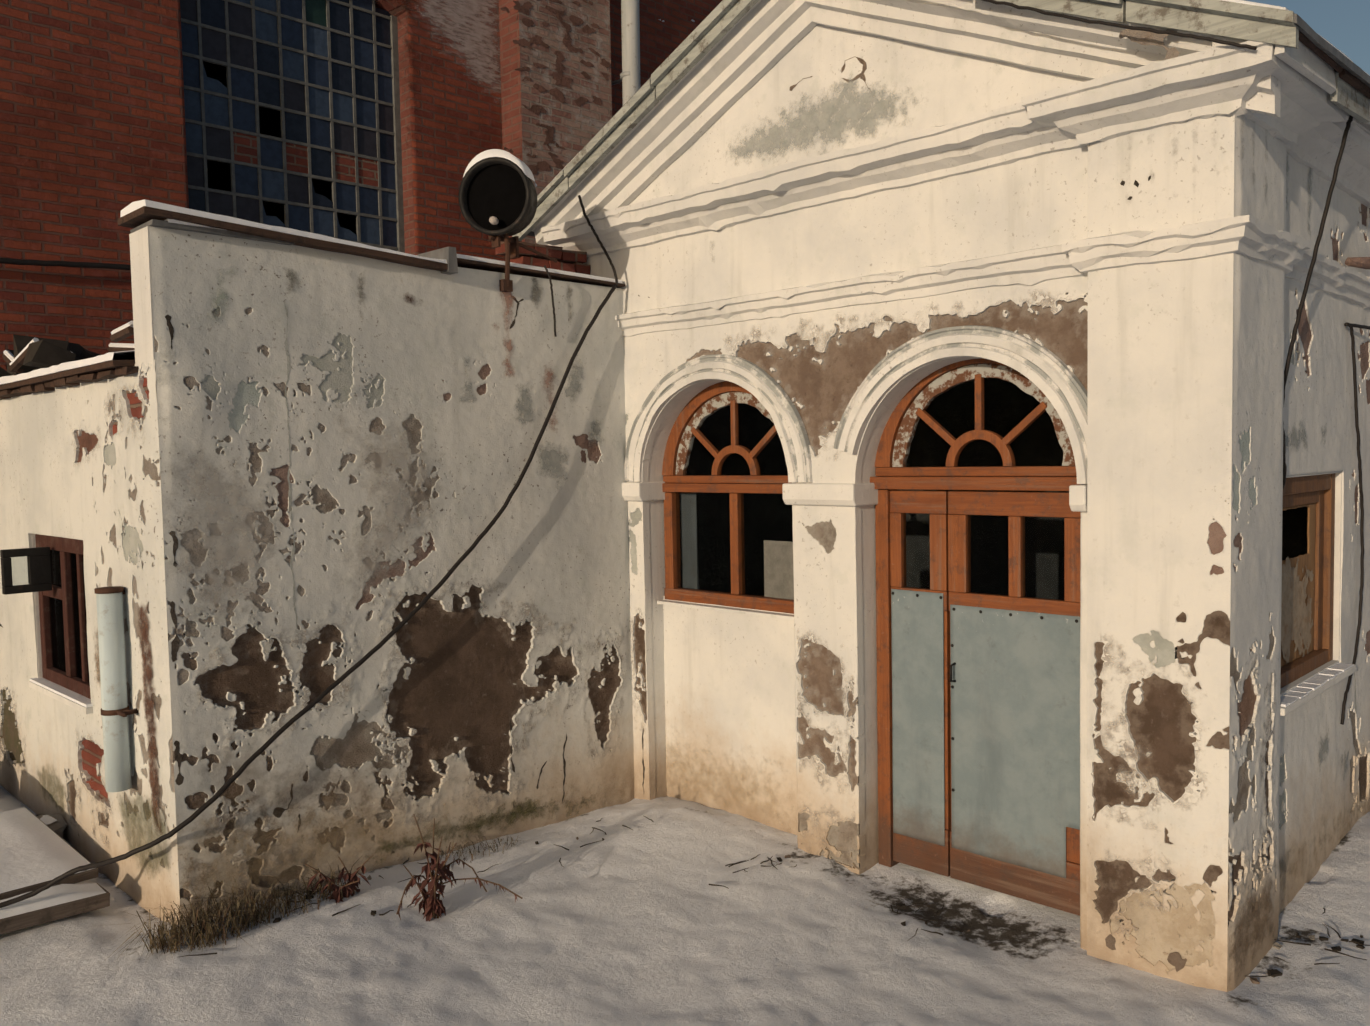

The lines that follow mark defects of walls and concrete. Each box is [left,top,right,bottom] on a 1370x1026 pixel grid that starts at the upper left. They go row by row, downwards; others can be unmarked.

spalling [501,0,611,174]
leakage [733,80,907,156]
peeling [1331,229,1343,262]
peeling [1359,204,1370,242]
spalling [687,295,1088,455]
spalling [1290,290,1312,381]
peeling [1357,328,1370,404]
spalling [68,333,647,898]
spalling [0,690,25,768]
spalling [798,637,858,791]
spalling [1093,611,1287,973]
peeling [179,881,223,914]